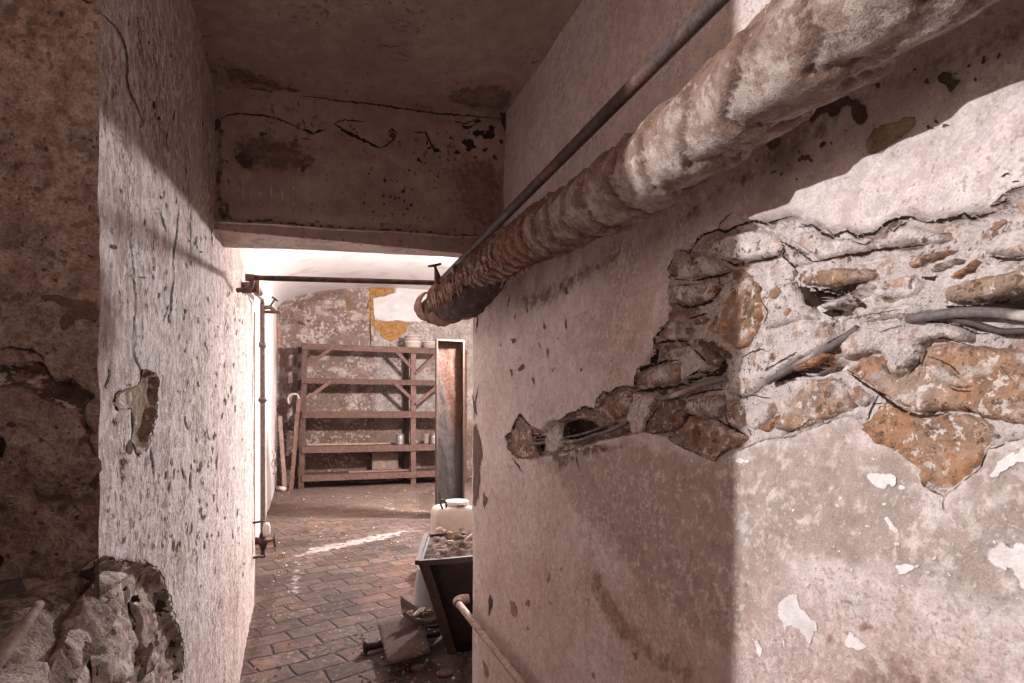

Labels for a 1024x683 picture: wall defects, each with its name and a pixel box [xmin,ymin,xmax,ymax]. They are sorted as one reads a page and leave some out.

crack [82,0,159,125]
peeling [913,52,1002,92]
crack [215,88,506,155]
peeling [809,96,948,154]
crack [0,346,45,361]
peeling [169,291,243,359]
flaking render [319,287,410,342]
flaking render [505,186,1024,508]
flaking render [0,361,96,457]
flaking render [89,369,240,562]
peeling [895,556,936,587]
flaking render [48,556,184,683]